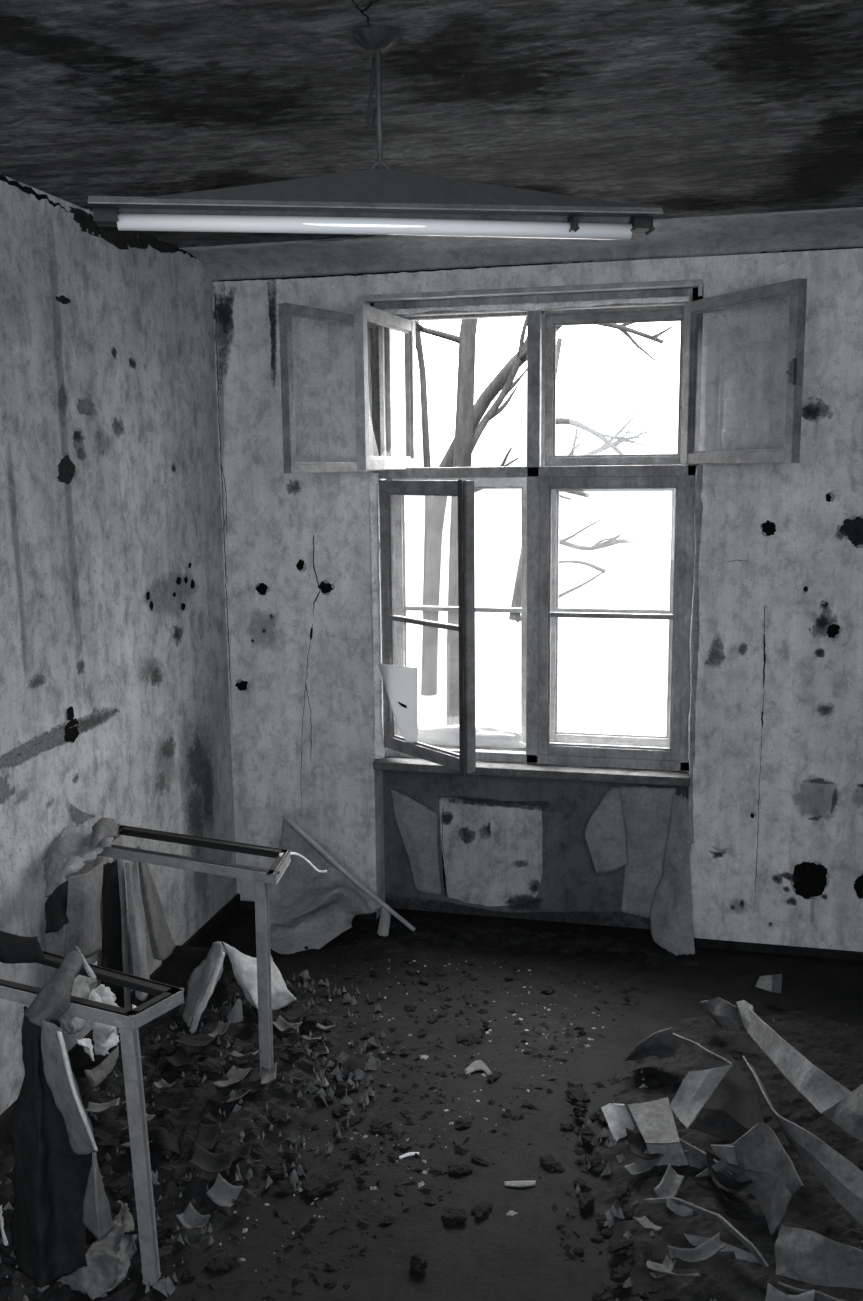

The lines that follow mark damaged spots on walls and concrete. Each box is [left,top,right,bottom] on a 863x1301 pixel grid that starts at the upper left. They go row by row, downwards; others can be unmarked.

crack [0,174,68,212]
crack [141,232,196,259]
spalling [54,384,98,486]
spalling [836,515,863,548]
spalling [808,601,840,657]
spalling [772,860,830,906]